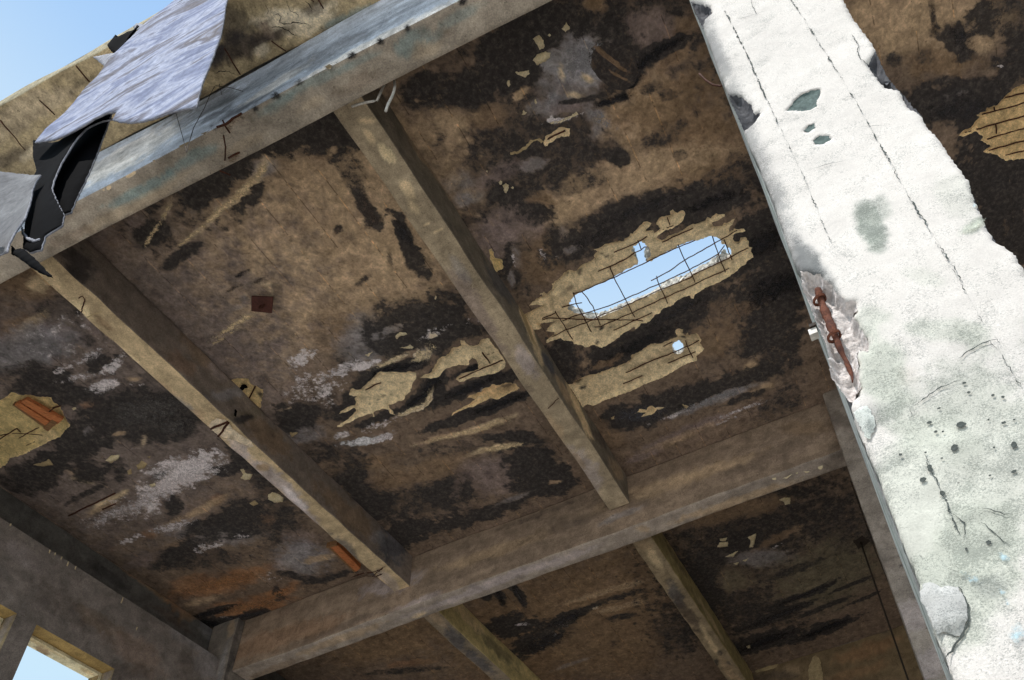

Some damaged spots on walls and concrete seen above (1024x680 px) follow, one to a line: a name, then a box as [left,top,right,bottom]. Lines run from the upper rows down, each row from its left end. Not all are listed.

crack [725,0,848,241]
spalling [959,84,1024,161]
spalling [526,210,753,348]
efflorescence [91,379,114,393]
water stain [365,346,434,383]
spalling [337,338,519,427]
spalling [568,328,704,407]
corrosion [813,287,854,383]
spalling [800,271,876,439]
efflorescence [337,431,391,446]
efflorescence [98,455,223,523]
crack [924,453,1009,545]